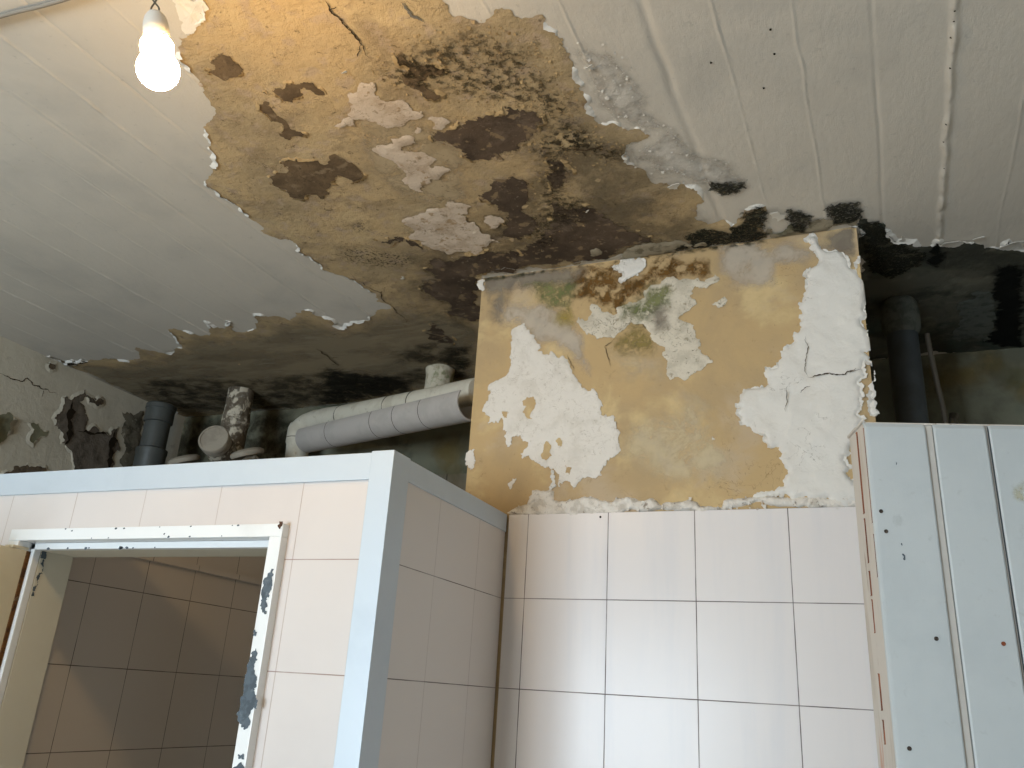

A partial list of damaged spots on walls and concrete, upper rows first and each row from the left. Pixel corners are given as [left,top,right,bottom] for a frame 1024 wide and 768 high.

crack [325,0,368,57]
damp [388,35,617,243]
peeling [44,0,785,389]
damp [709,181,746,196]
damp [672,207,809,285]
damp [785,202,946,279]
crack [0,373,57,394]
flaking render [0,390,144,470]
damp [83,317,474,463]
peeling [251,387,424,411]
peeling [482,219,1024,515]
crack [785,336,859,407]